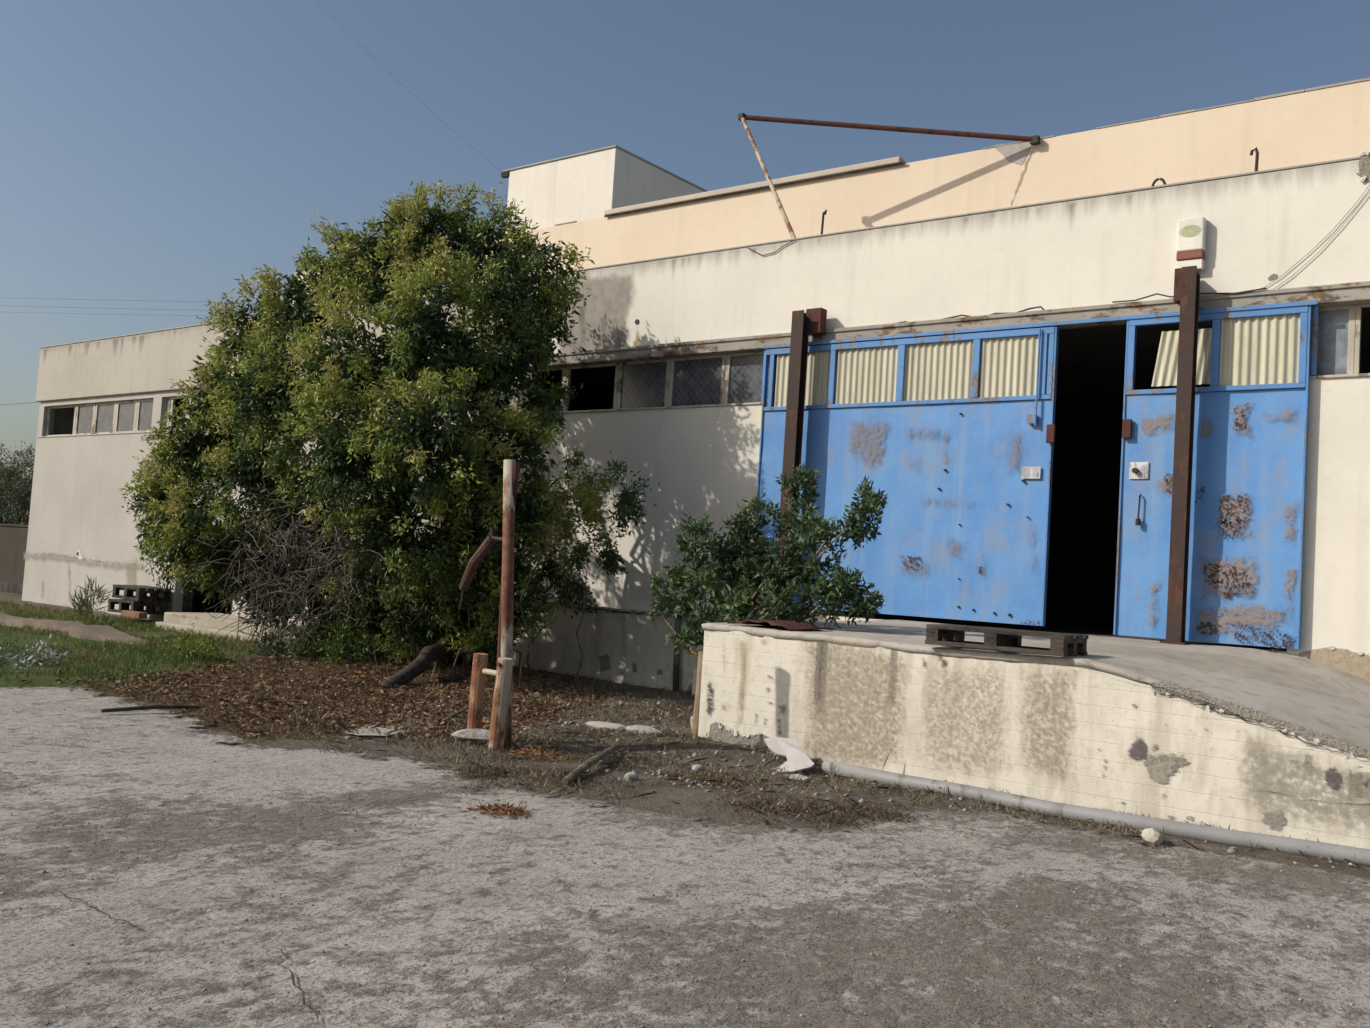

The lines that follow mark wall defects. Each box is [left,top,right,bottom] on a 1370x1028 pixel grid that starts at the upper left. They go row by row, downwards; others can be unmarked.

leakage [560,277,631,353]
rust [1194,486,1250,539]
rust [1203,563,1256,598]
rust [1197,622,1297,652]
spalling [1299,646,1370,682]
leakage [923,653,1000,768]
leakage [1024,674,1071,779]
leakage [1245,744,1370,825]